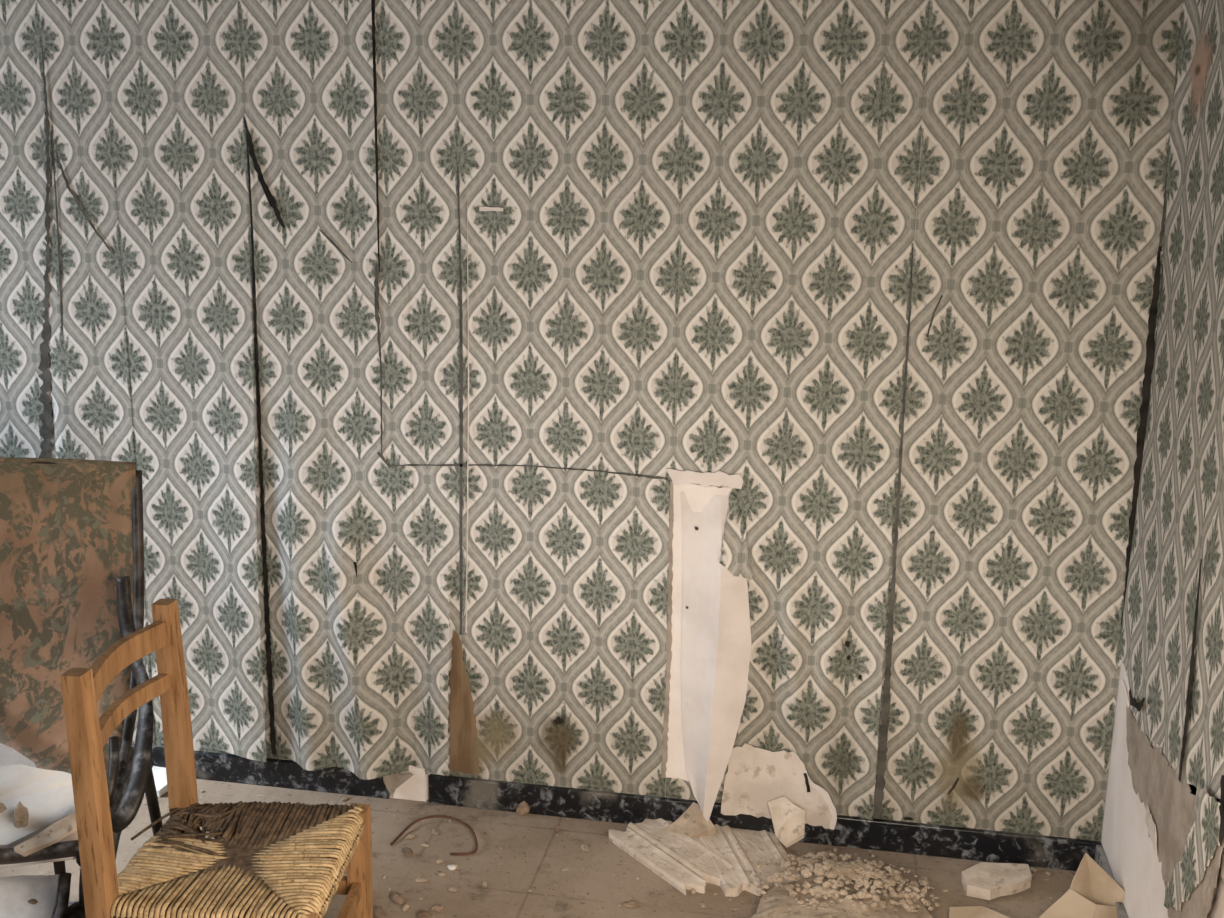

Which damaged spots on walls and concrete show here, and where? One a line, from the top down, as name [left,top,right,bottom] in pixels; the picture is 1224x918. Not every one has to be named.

leakage [952,715,966,755]
leakage [948,778,982,799]
flaking render [1111,679,1224,918]